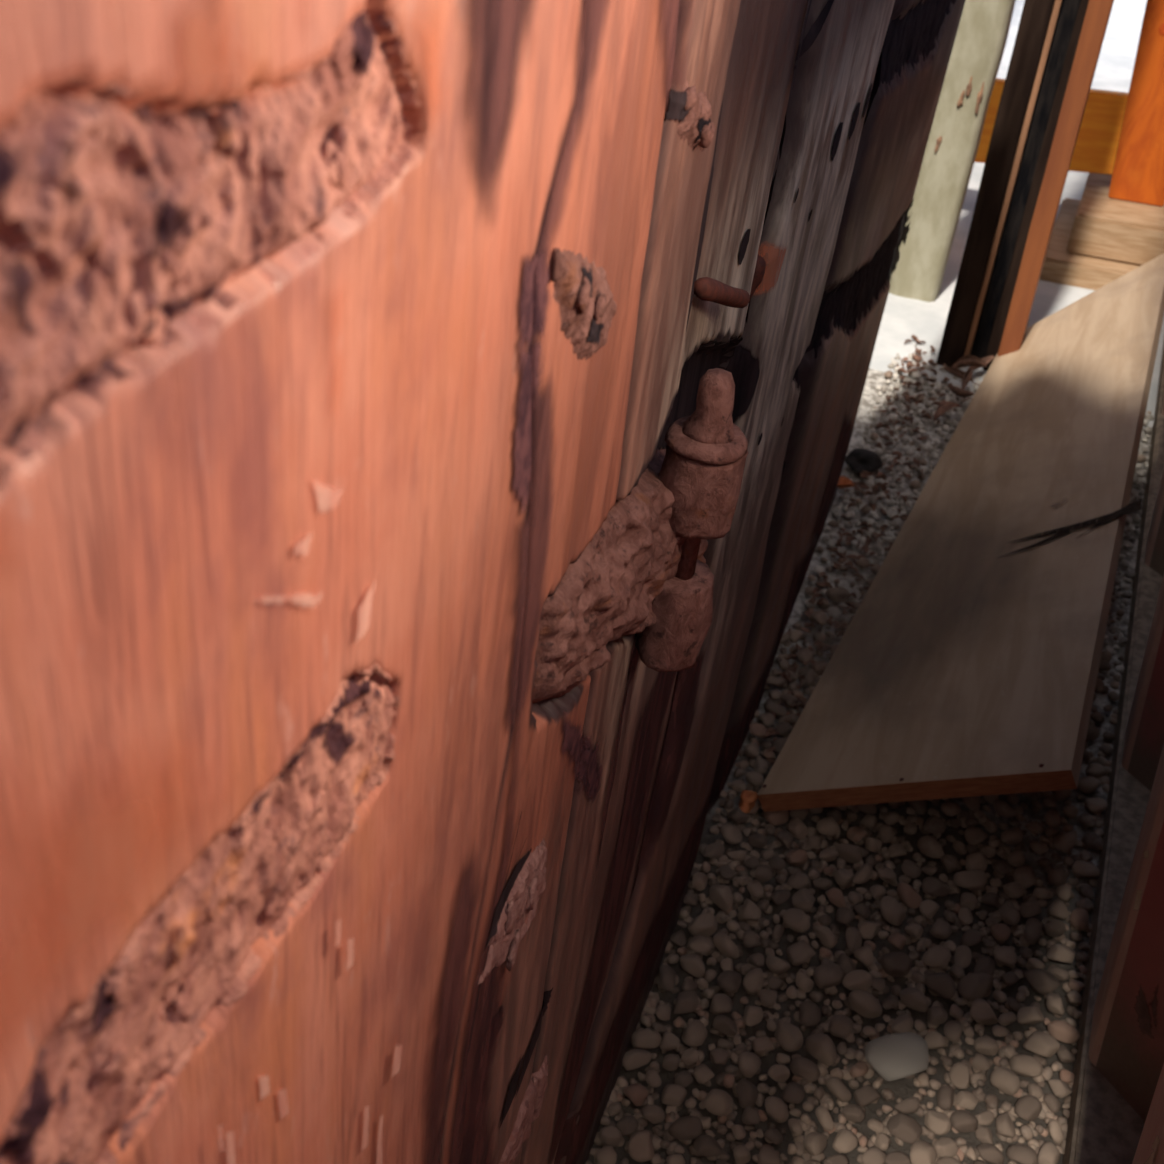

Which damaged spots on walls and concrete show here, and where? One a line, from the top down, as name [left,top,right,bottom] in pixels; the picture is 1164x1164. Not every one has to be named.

spalling [0,9,420,486]
spalling [0,663,400,1164]
peeling [392,1046,402,1076]